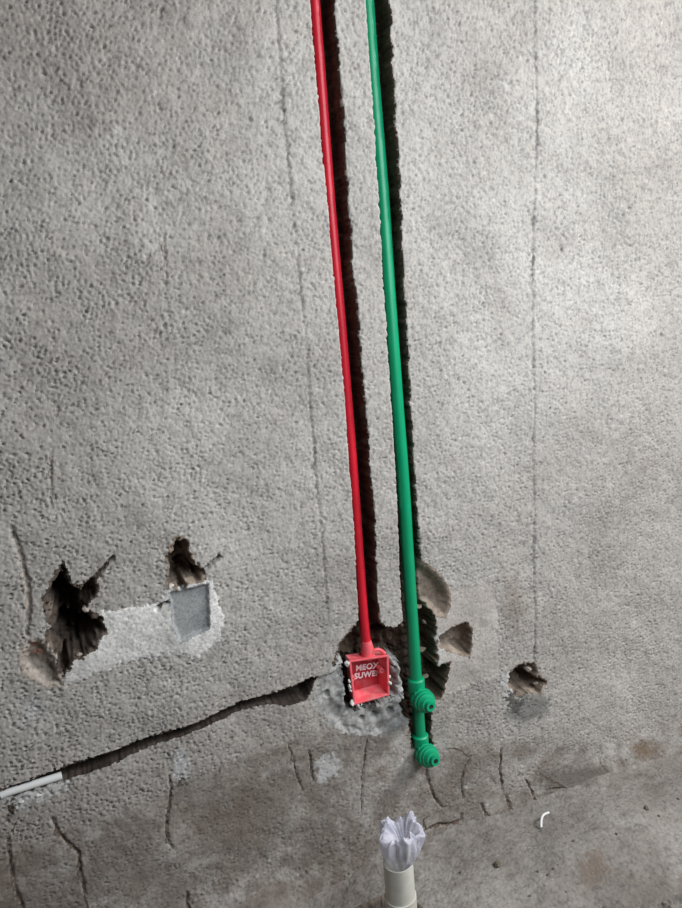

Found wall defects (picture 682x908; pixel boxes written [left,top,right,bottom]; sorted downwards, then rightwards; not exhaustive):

spalling [164,535,218,591]
spalling [17,556,112,691]
spalling [414,553,473,700]
spalling [332,580,414,749]
spalling [507,661,547,697]
spalling [424,711,434,745]
crack [0,676,318,908]
crack [423,769,460,830]
crack [448,748,511,816]
crack [526,772,565,800]